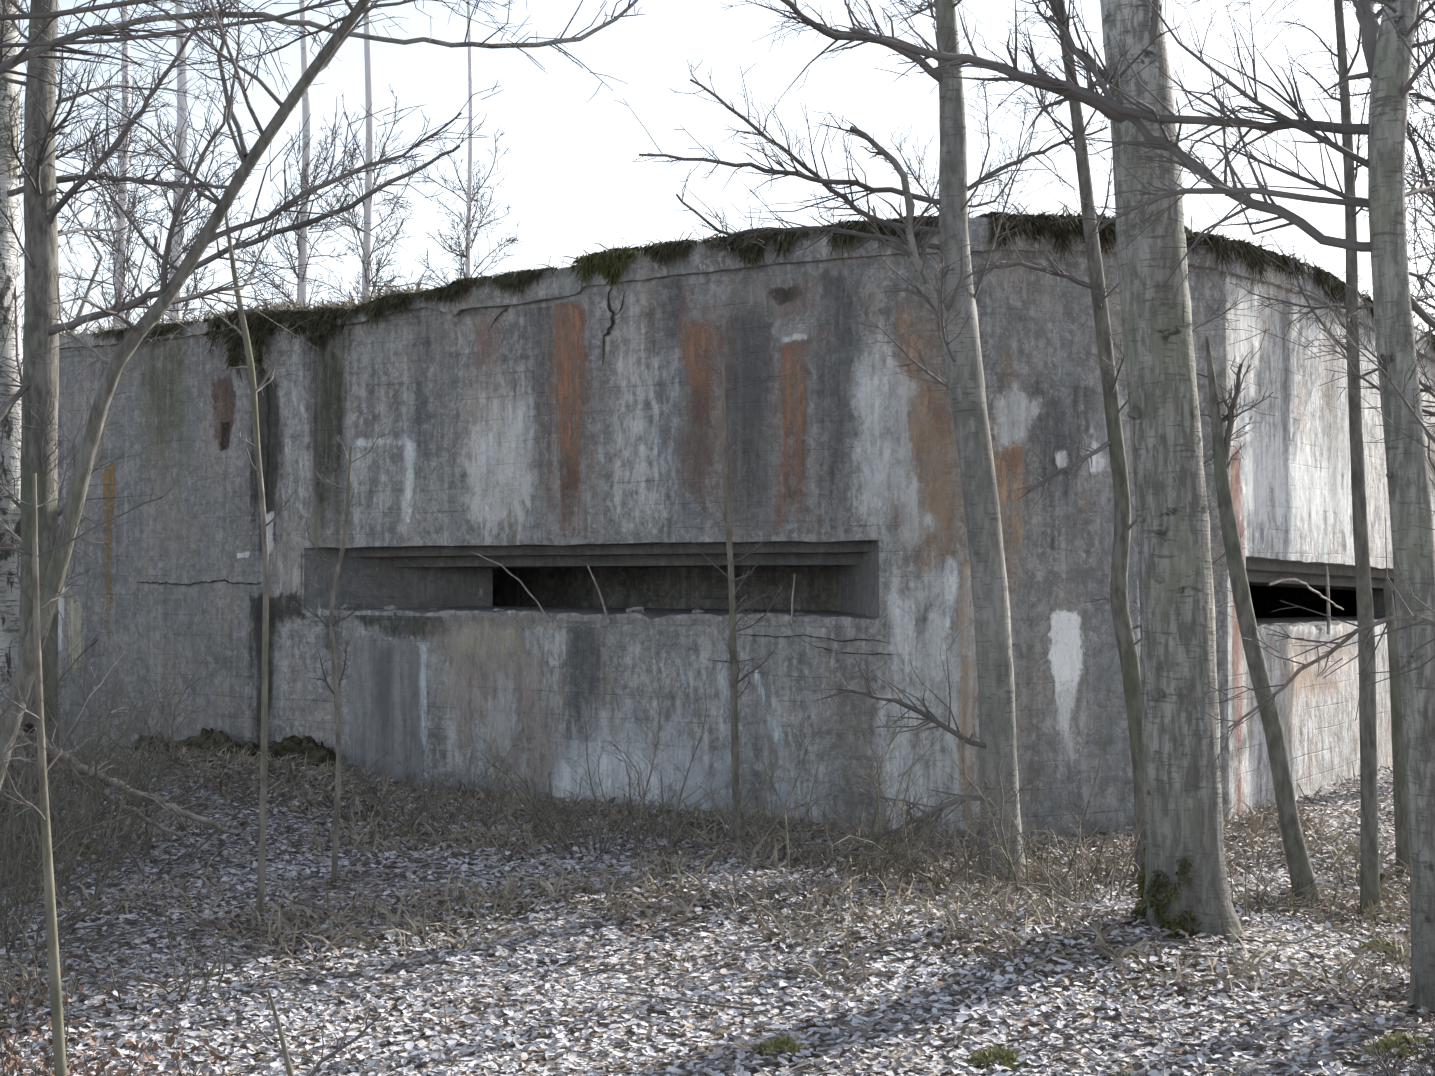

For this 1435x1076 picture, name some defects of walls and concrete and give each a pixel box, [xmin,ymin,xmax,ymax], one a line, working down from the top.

crack [602,287,626,365]
damp [250,369,282,553]
crack [263,370,271,505]
damp [306,329,416,524]
corrosion [777,333,807,527]
corrosion [894,311,952,568]
crack [138,578,262,586]
damp [249,593,305,745]
corrosion [956,562,979,828]